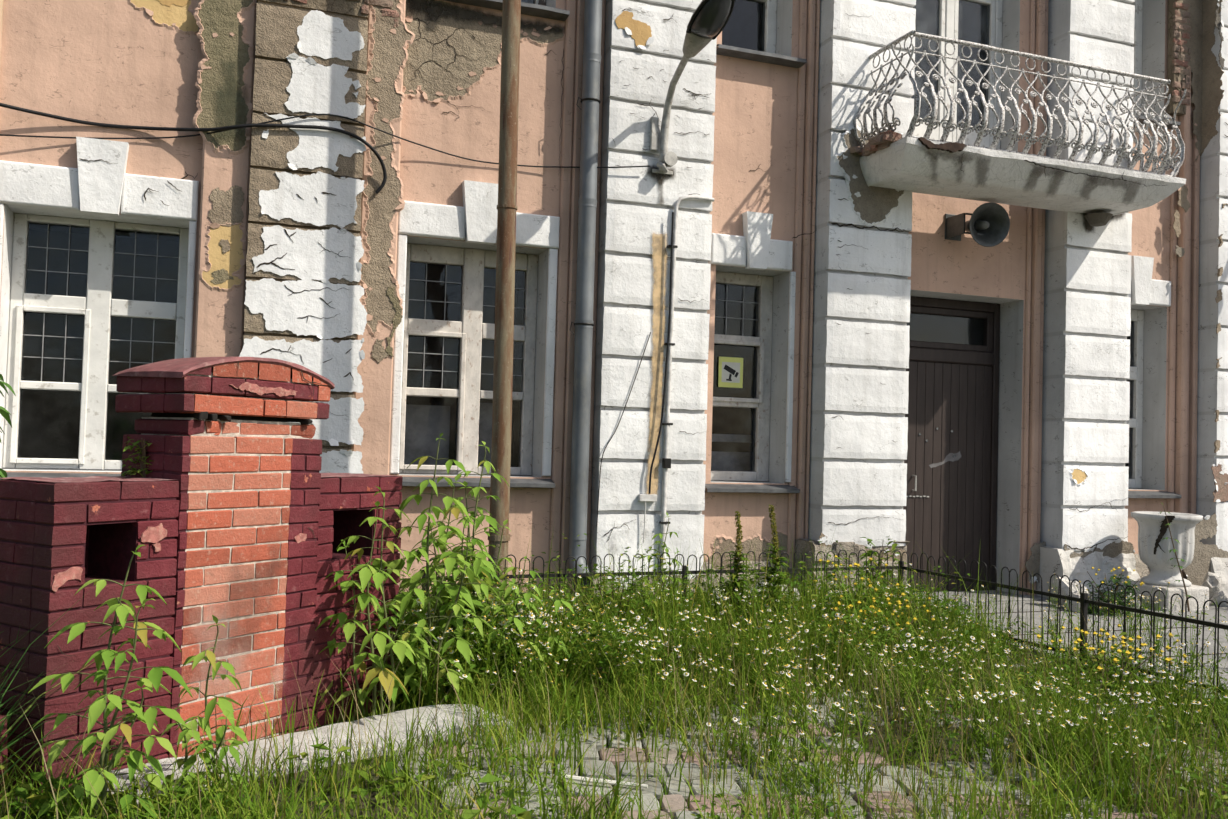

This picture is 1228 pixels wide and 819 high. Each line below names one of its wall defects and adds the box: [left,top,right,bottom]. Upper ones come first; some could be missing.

crack [405,14,488,121]
flaking render [520,21,565,47]
crack [545,49,564,164]
peeling [615,8,668,51]
flaking render [1167,0,1225,163]
flaking render [834,126,967,227]
flaking render [127,0,502,474]
spalling [1215,267,1223,303]
peeling [51,567,83,592]
peeling [140,523,167,552]
flaking render [1064,539,1136,563]
flaking render [1182,440,1228,586]